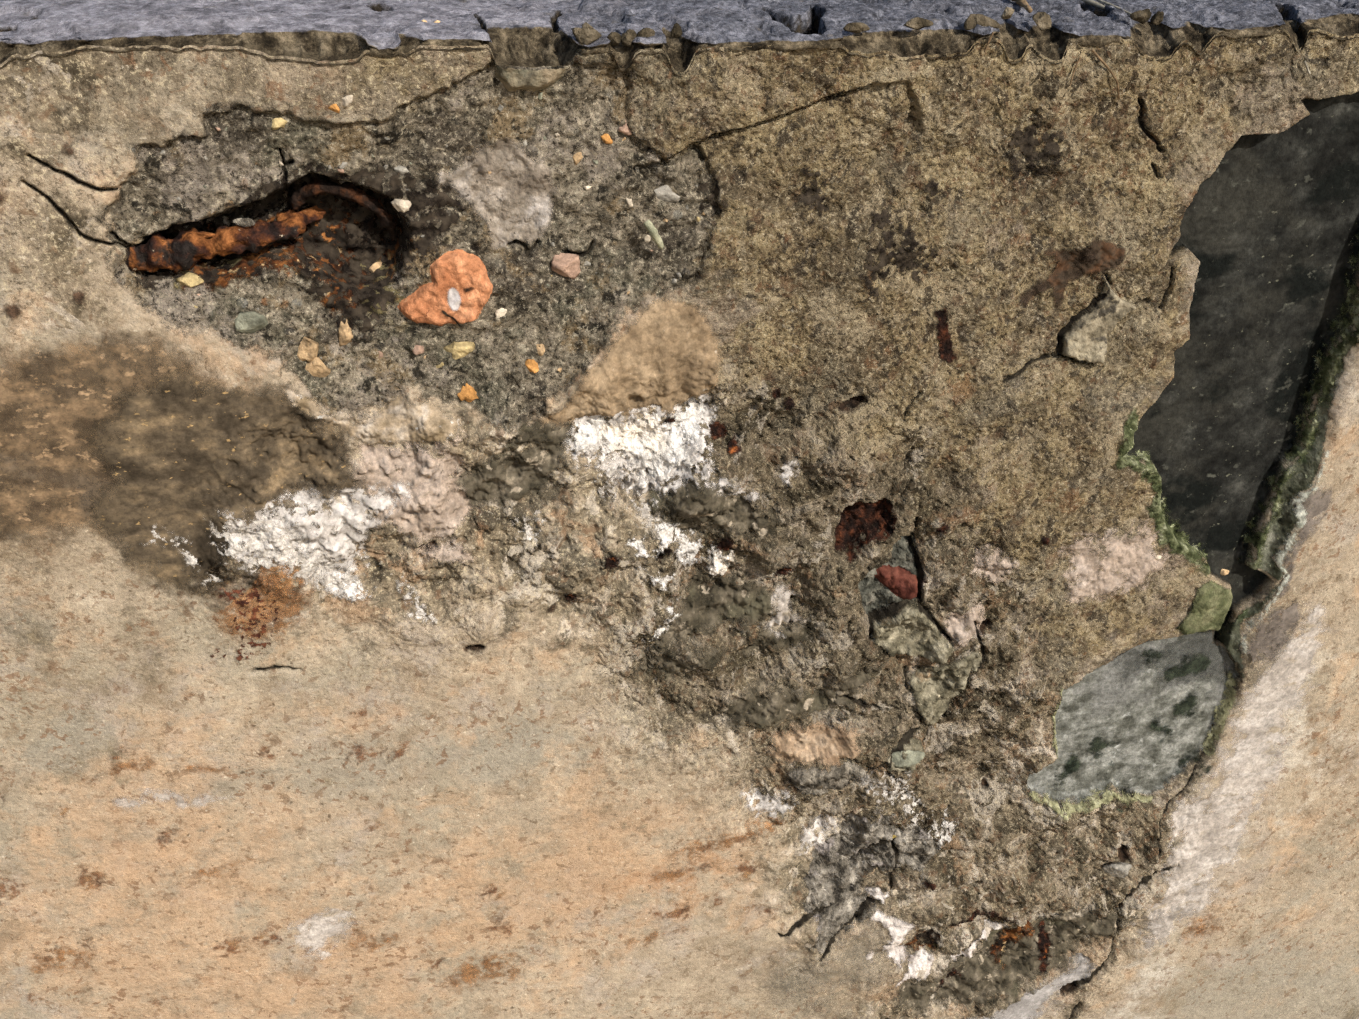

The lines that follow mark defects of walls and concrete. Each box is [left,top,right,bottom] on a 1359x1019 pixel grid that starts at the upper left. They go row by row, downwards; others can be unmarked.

corrosion [114,162,468,345]
spalling [95,50,723,563]
water stain [87,371,410,639]
water stain [396,576,437,623]
water stain [454,395,835,686]
corrosion [834,498,898,563]
spalling [1026,91,1359,804]
water stain [717,660,890,730]
flaking render [768,721,861,765]
spalling [801,806,944,987]
peeling [951,919,1005,961]
crack [1069,734,1214,1019]